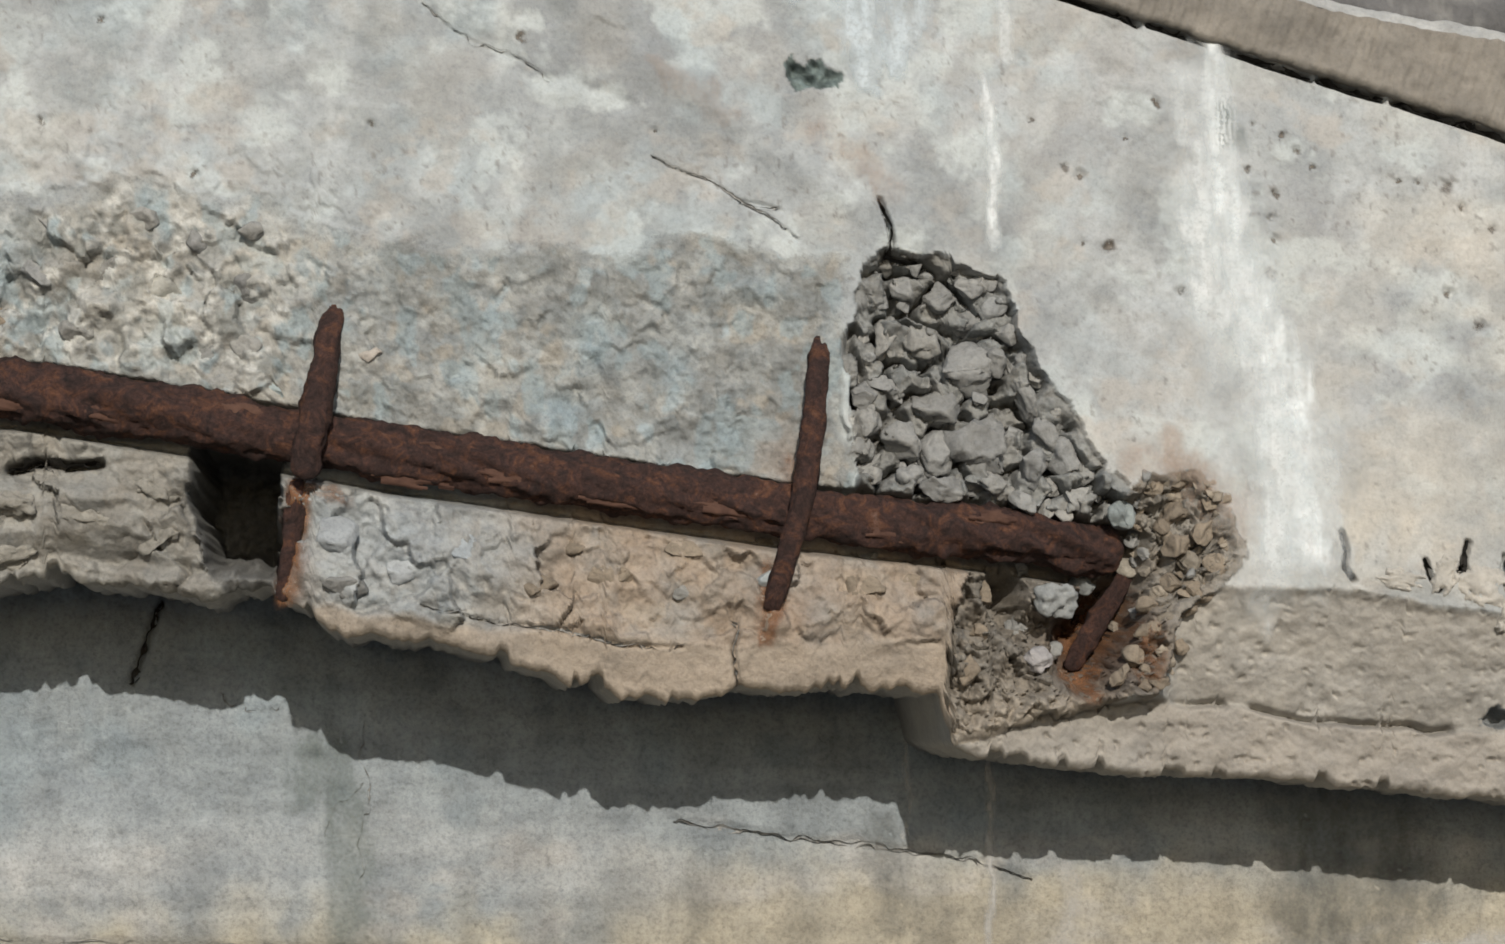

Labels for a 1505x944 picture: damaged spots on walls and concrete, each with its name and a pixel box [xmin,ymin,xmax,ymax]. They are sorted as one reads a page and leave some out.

water stain [1180,42,1332,571]
spalling [0,168,1250,747]
rust [278,479,310,603]
crack [129,601,164,685]
rust [1064,598,1122,699]
crack [674,819,1032,879]